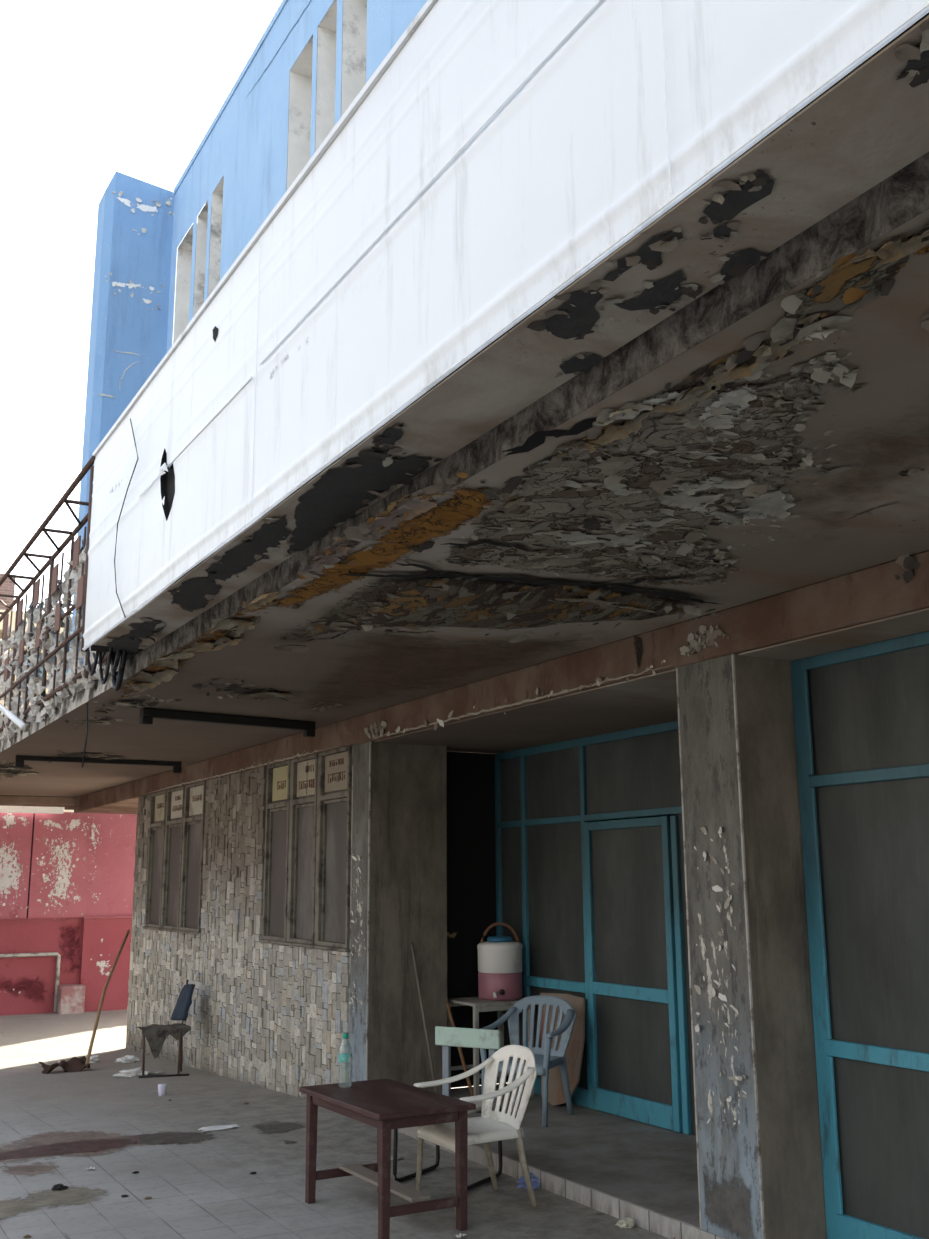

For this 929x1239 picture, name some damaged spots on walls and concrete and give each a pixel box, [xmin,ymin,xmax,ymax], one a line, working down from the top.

peeling [895,21,929,88]
peeling [107,186,174,235]
peeling [105,273,164,310]
peeling [527,169,774,378]
peeling [437,223,929,586]
peeling [168,423,468,612]
peeling [105,618,166,652]
peeling [0,813,102,917]
peeling [694,827,747,1125]
damp [0,1131,213,1163]